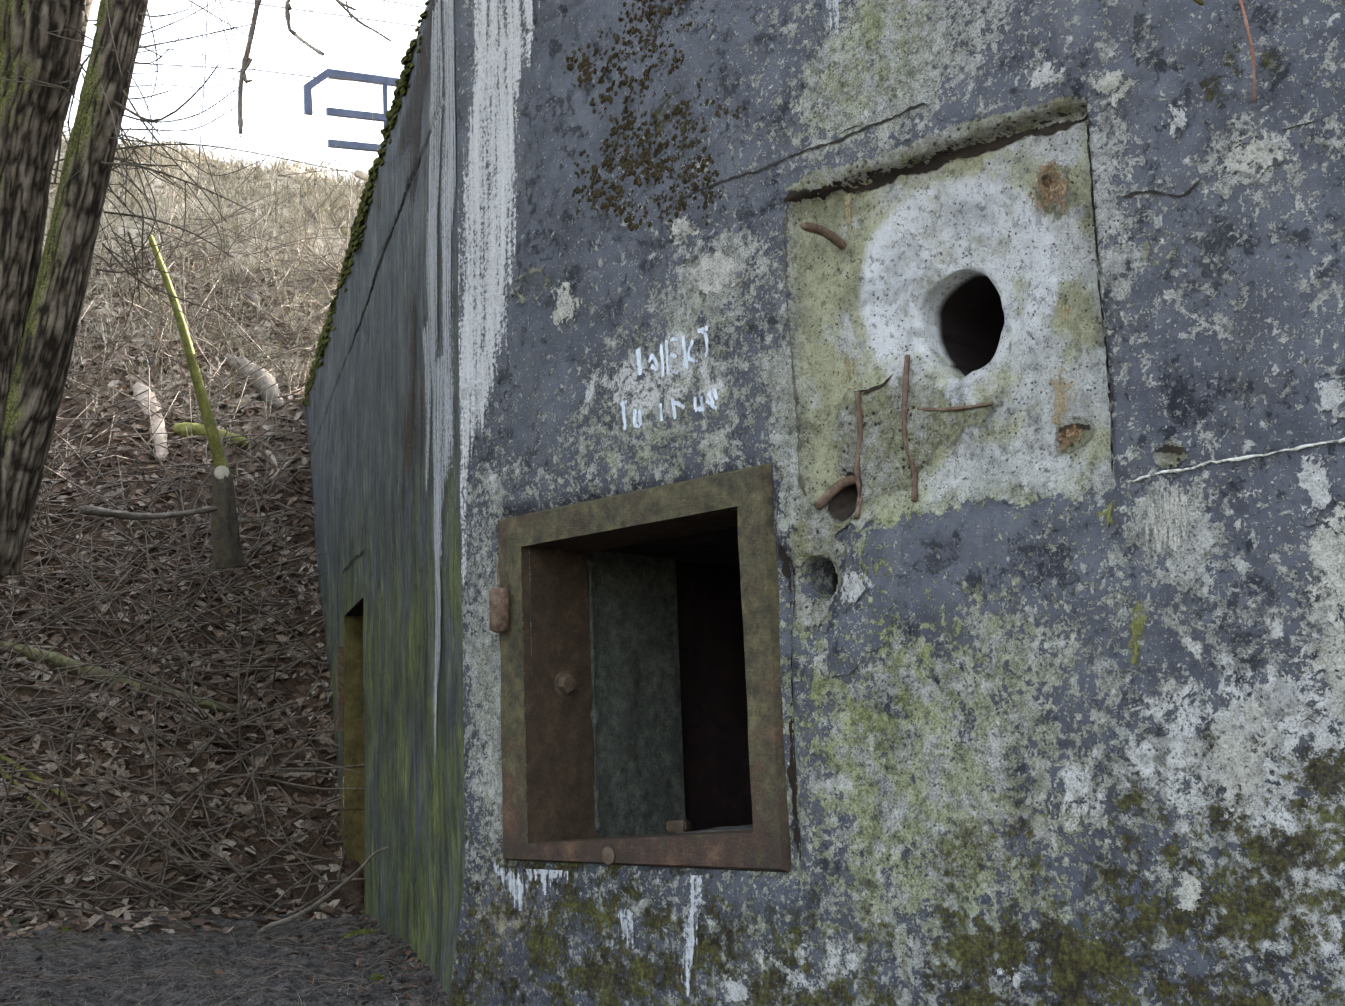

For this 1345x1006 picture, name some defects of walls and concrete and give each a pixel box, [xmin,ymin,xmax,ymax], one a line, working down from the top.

spalling [789,367,1012,634]
crack [677,102,1345,496]
rust [1028,159,1071,214]
rust [1049,368,1083,452]